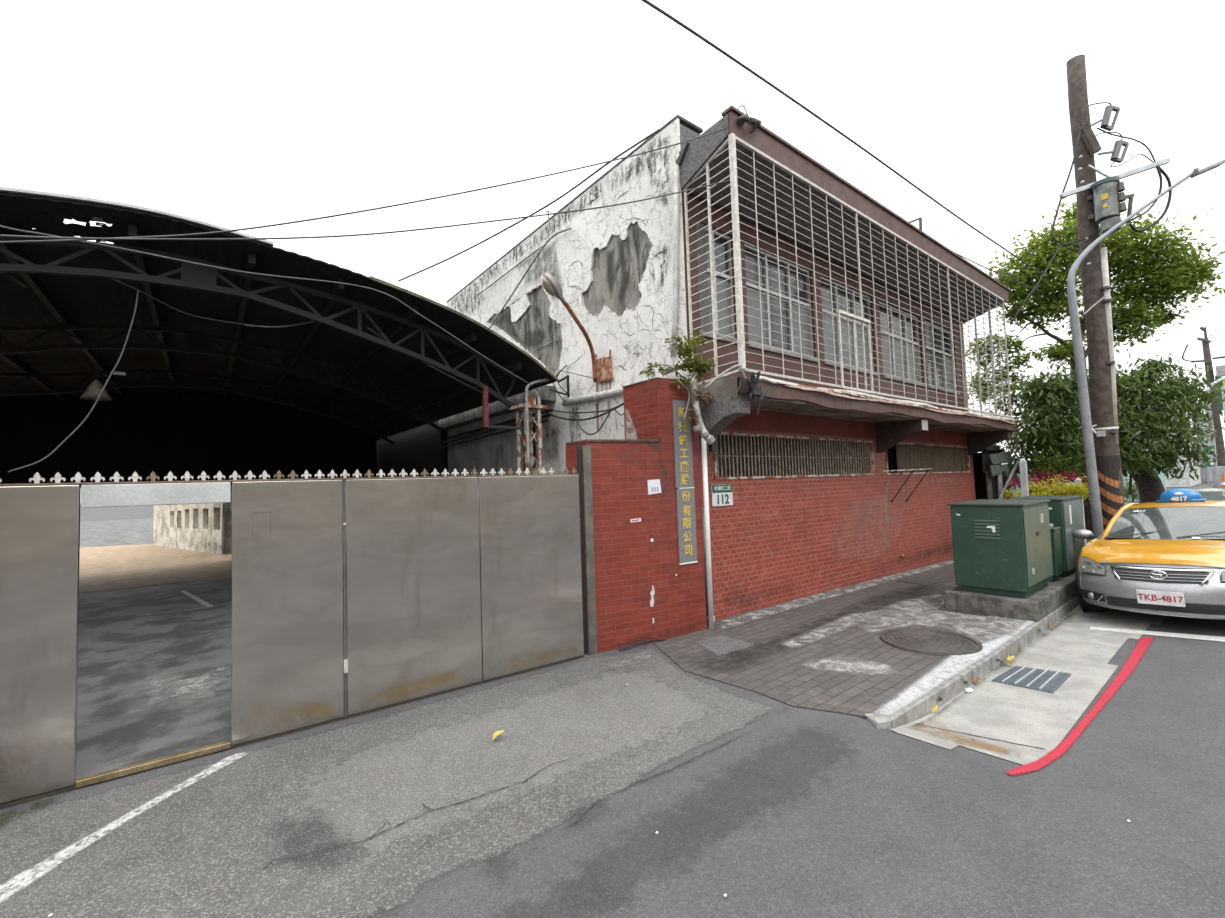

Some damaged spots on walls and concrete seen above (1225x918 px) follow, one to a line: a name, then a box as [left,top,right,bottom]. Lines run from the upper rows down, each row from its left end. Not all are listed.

flaking render [488,285,563,375]
crack [463,239,594,388]
water stain [452,139,668,314]
flaking render [581,221,654,317]
crack [619,305,666,372]